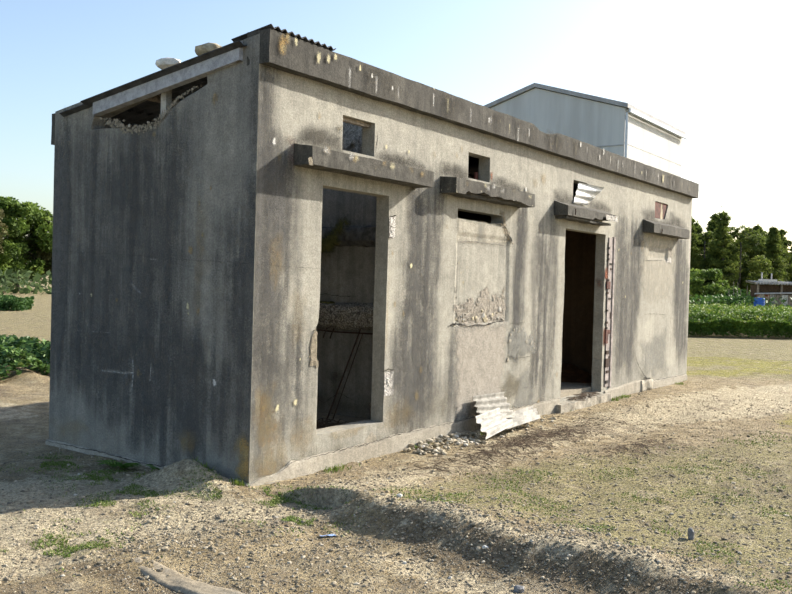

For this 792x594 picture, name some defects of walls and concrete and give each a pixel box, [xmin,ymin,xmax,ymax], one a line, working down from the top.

spalling [98,84,201,134]
damp [297,128,341,150]
damp [50,74,307,480]
damp [393,188,444,419]
peeling [453,284,506,414]
damp [614,222,640,373]
damp [674,241,688,359]